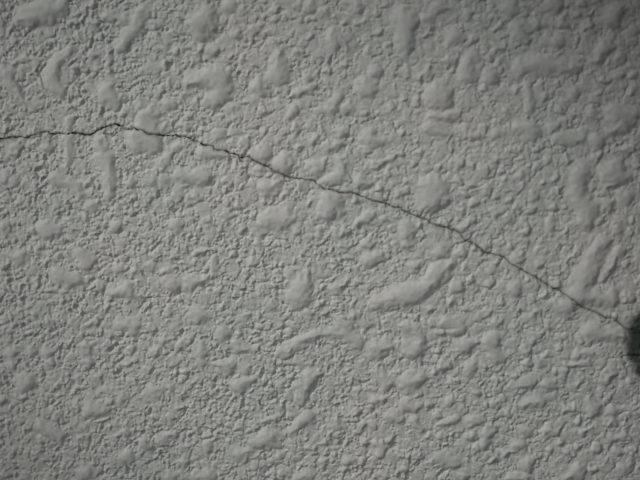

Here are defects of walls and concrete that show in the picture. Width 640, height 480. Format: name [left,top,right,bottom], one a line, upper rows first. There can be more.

crack [0,123,625,328]